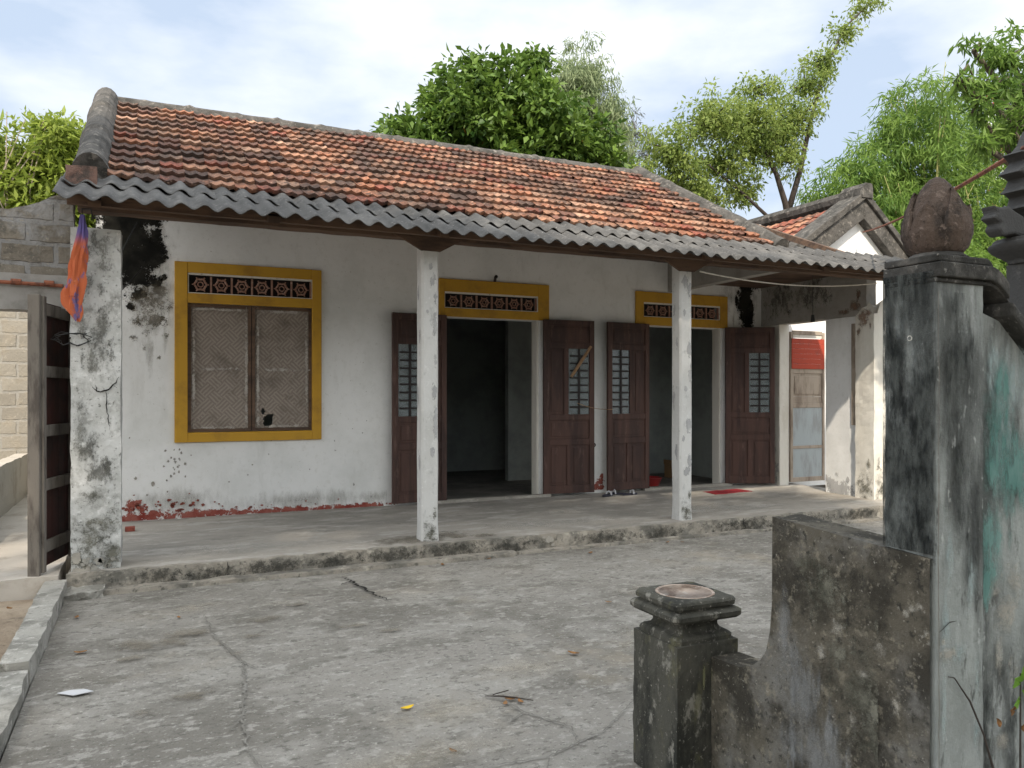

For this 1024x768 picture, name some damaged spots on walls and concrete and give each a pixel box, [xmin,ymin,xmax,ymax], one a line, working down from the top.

water stain [78,215,173,371]
water stain [74,404,113,483]
crack [93,377,119,429]
peeling [122,448,395,522]
water stain [946,292,1016,624]
crack [341,577,390,600]
water stain [819,639,878,758]
water stain [976,644,1017,768]